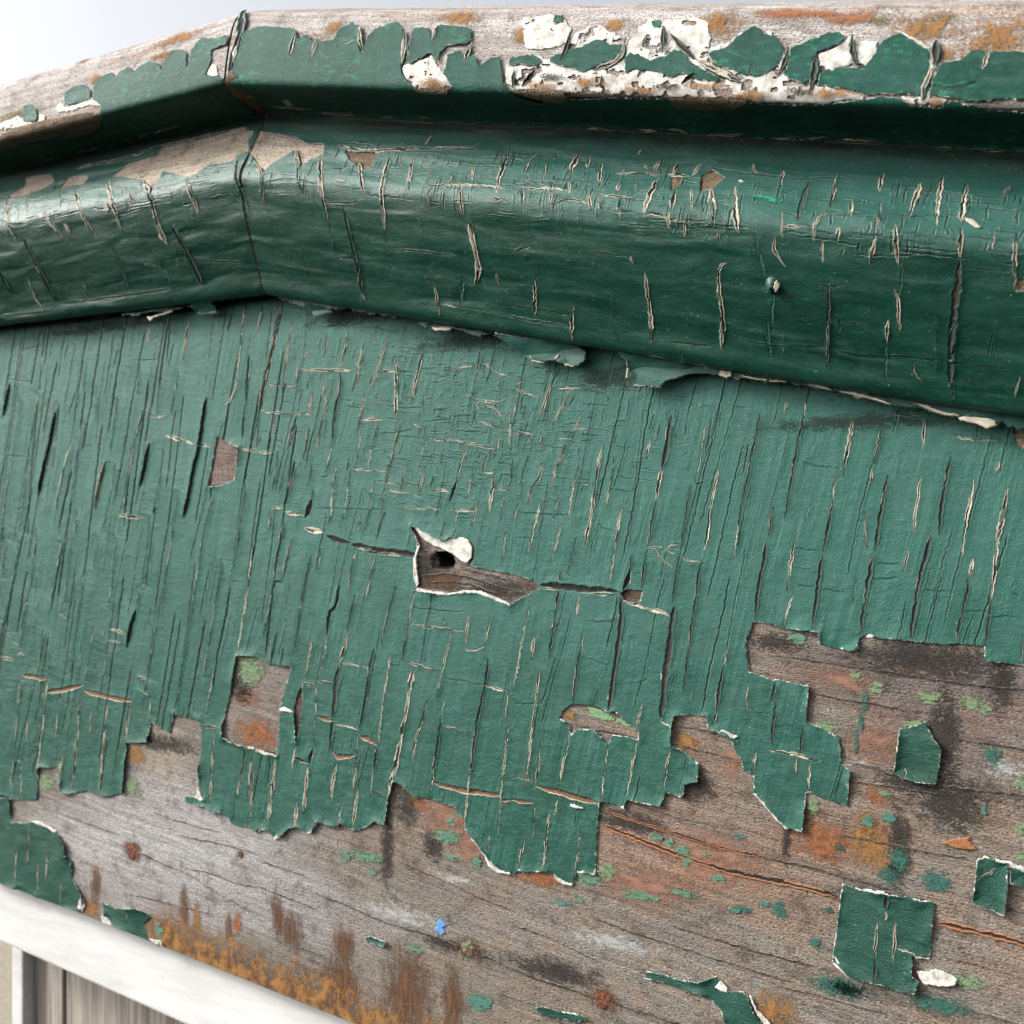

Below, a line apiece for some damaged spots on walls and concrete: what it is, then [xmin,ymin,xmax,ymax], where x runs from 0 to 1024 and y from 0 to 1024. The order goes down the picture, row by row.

peeling [9,125,324,198]
crack [218,135,1020,398]
peeling [208,438,238,487]
peeling [411,526,540,606]
crack [0,179,1023,871]
peeling [0,622,1024,1024]